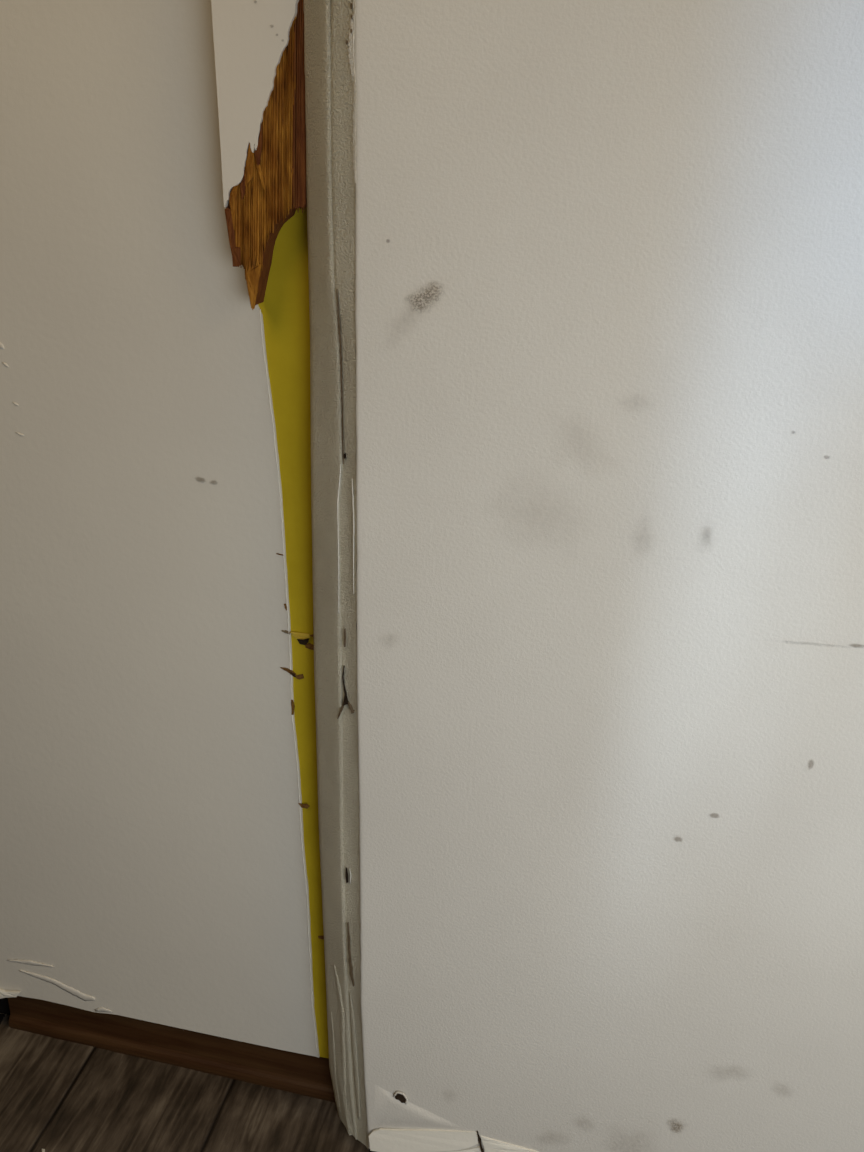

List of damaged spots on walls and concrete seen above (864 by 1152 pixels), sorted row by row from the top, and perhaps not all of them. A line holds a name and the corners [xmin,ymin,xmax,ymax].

crack [336,289,355,719]
peeling [0,989,21,999]
peeling [369,1128,538,1152]